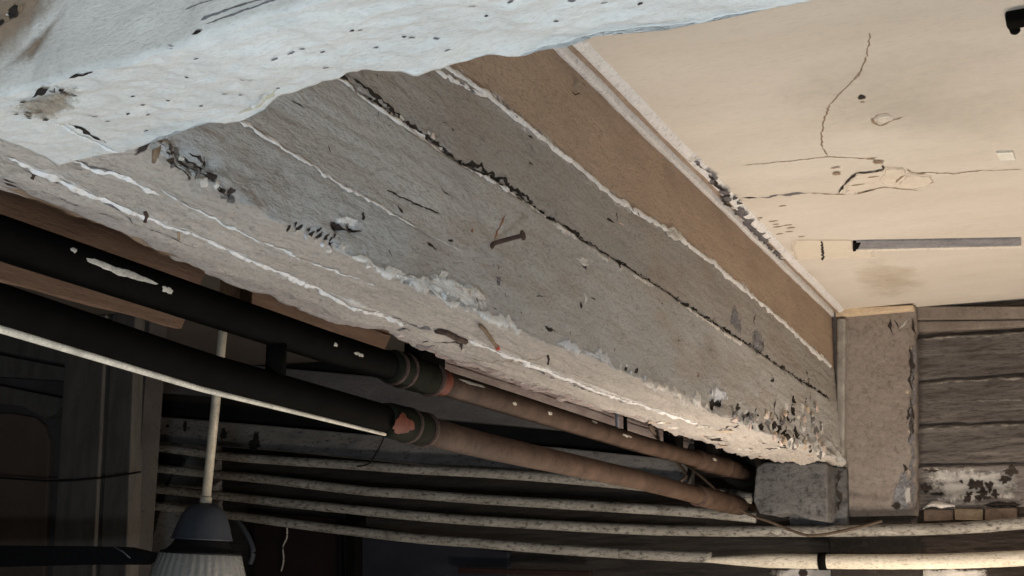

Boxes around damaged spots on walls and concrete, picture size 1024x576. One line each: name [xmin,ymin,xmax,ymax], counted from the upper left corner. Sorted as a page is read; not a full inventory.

spalling [166,144,236,203]
peeling [286,212,522,335]
crack [342,75,845,398]
crack [749,33,875,165]
peeling [830,161,933,196]
crack [871,113,902,126]
crack [907,168,1021,176]
spalling [395,328,826,461]
peeling [888,318,1021,521]